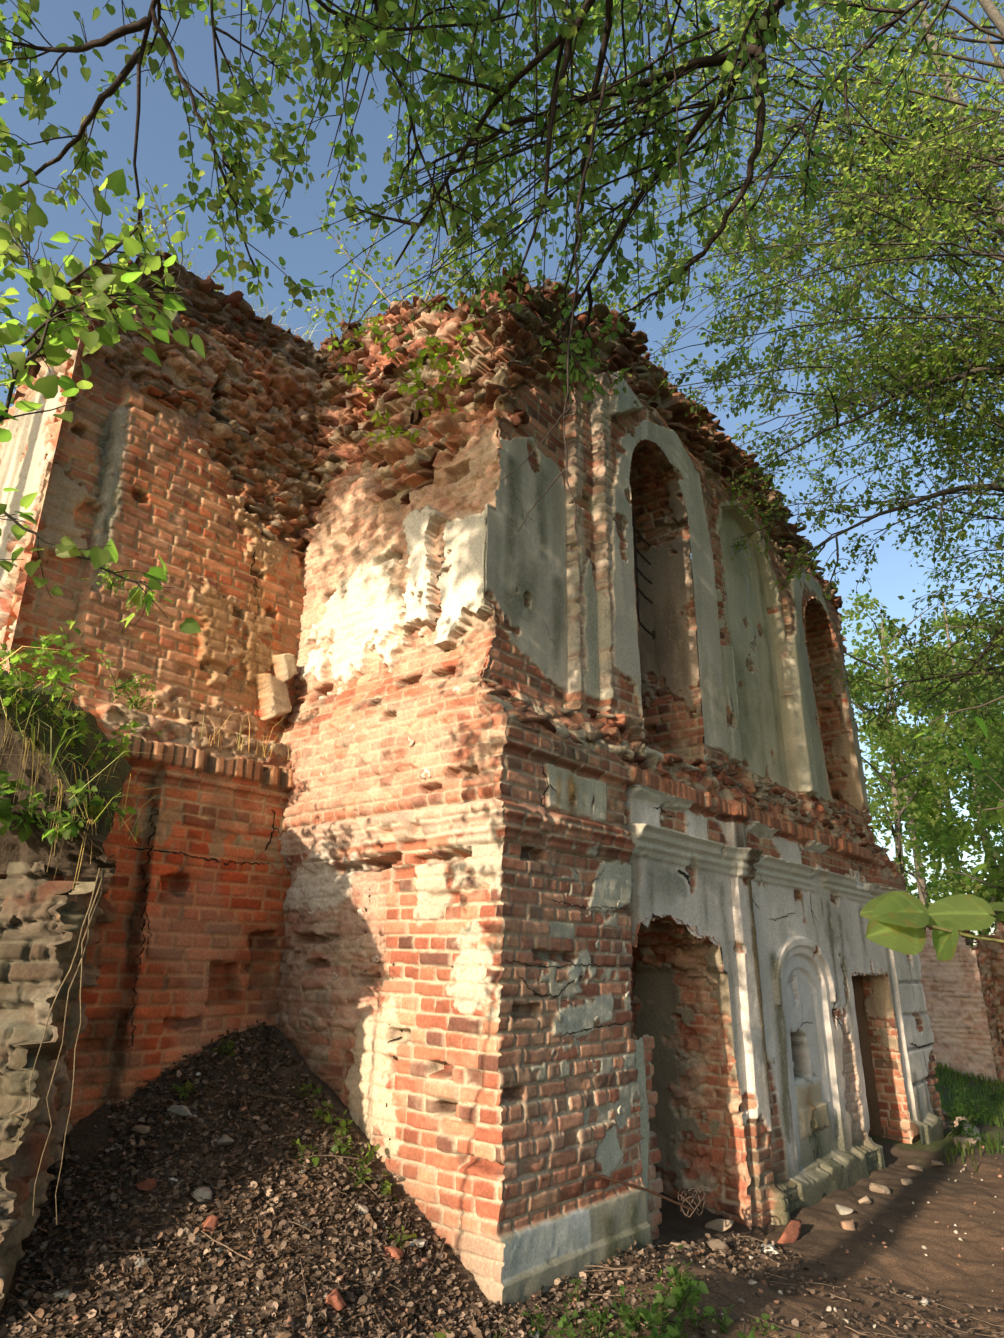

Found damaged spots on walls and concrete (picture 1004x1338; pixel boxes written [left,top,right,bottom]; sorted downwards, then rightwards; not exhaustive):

spalling [0,254,907,892]
spalling [0,902,22,926]
crack [126,796,279,1064]
crack [504,959,631,1037]
spalling [0,1177,37,1246]
flaking render [739,1057,801,1228]